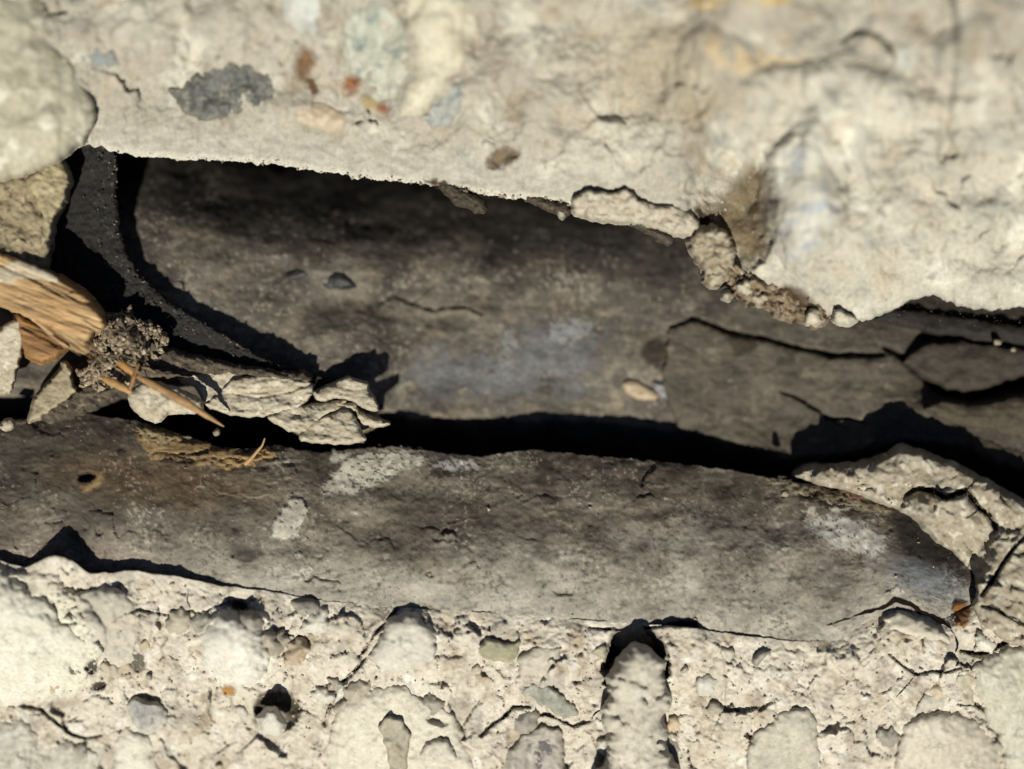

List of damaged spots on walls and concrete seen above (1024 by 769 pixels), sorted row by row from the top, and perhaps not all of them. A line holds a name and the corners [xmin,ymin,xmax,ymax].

spalling [695,209,713,225]
crack [709,323,905,360]
crack [931,380,1024,402]
crack [783,393,861,429]
peeling [128,424,280,470]
spalling [78,472,103,491]
peeling [661,308,1024,648]
peeling [263,498,309,540]
spalling [229,601,249,611]
crack [826,480,1024,697]